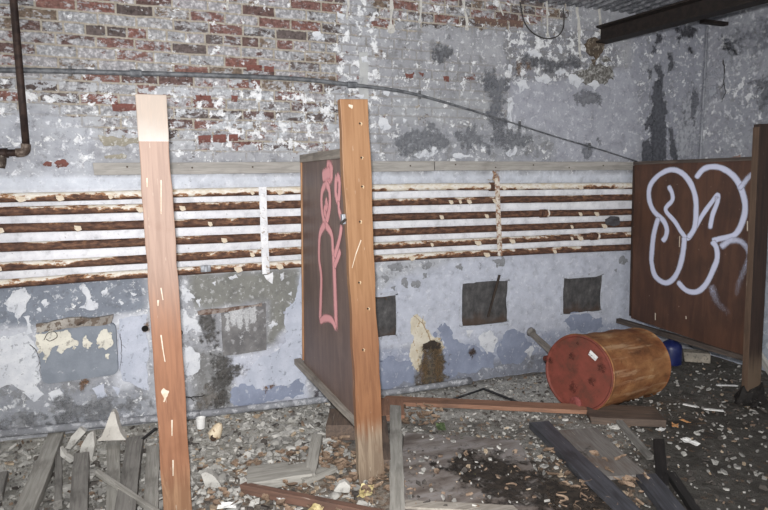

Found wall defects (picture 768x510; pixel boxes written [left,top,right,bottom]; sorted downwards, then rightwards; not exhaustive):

leakage [432,43,453,64]
leakage [522,54,587,75]
spalling [506,37,615,92]
spalling [112,103,136,112]
spalling [198,134,238,145]
leakage [395,70,532,156]
leakage [574,90,601,106]
leakage [642,54,700,161]
peeling [79,283,108,310]
peeling [0,288,150,402]
leakage [196,306,257,410]
peeling [409,314,445,372]